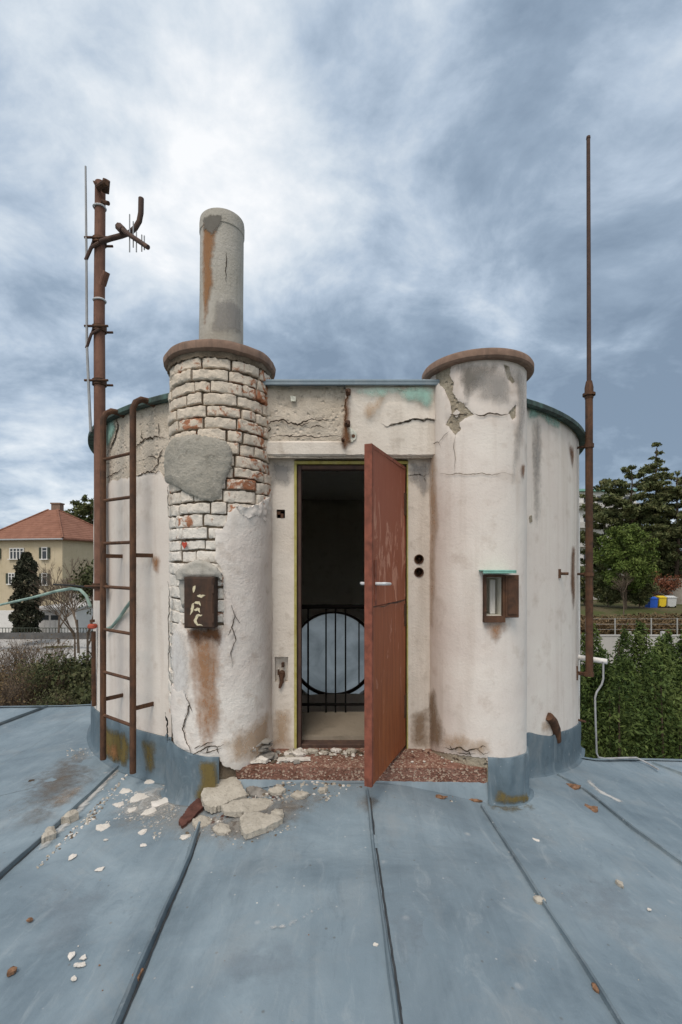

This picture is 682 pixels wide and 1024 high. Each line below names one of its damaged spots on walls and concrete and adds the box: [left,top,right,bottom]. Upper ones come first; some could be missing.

corrosion [203,229,214,310]
peeling [106,402,170,485]
corrosion [342,397,351,448]
crack [411,412,515,481]
crack [165,581,222,755]
corrosion [188,628,220,732]
crack [228,605,240,668]
leakage [415,693,462,745]